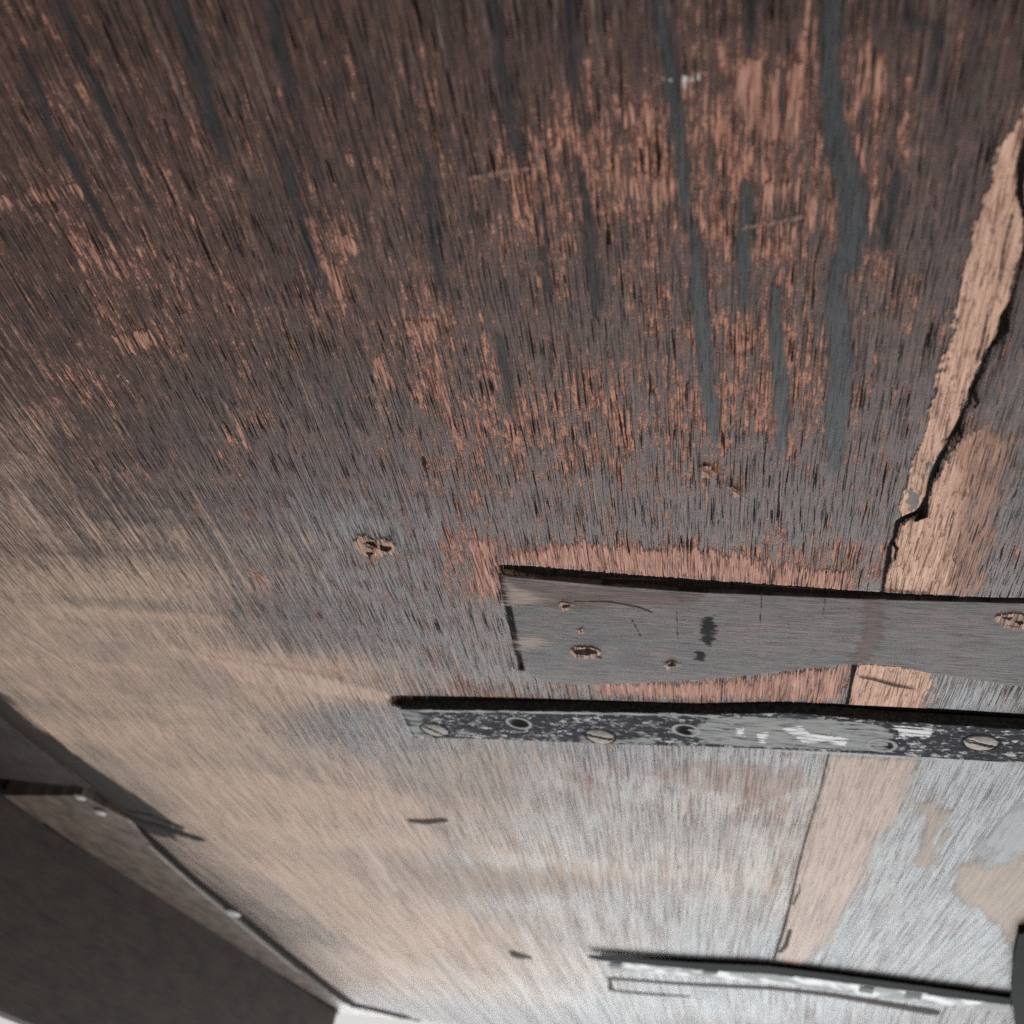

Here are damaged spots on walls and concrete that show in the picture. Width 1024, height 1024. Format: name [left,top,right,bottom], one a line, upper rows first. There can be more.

crack [882,137,1024,592]